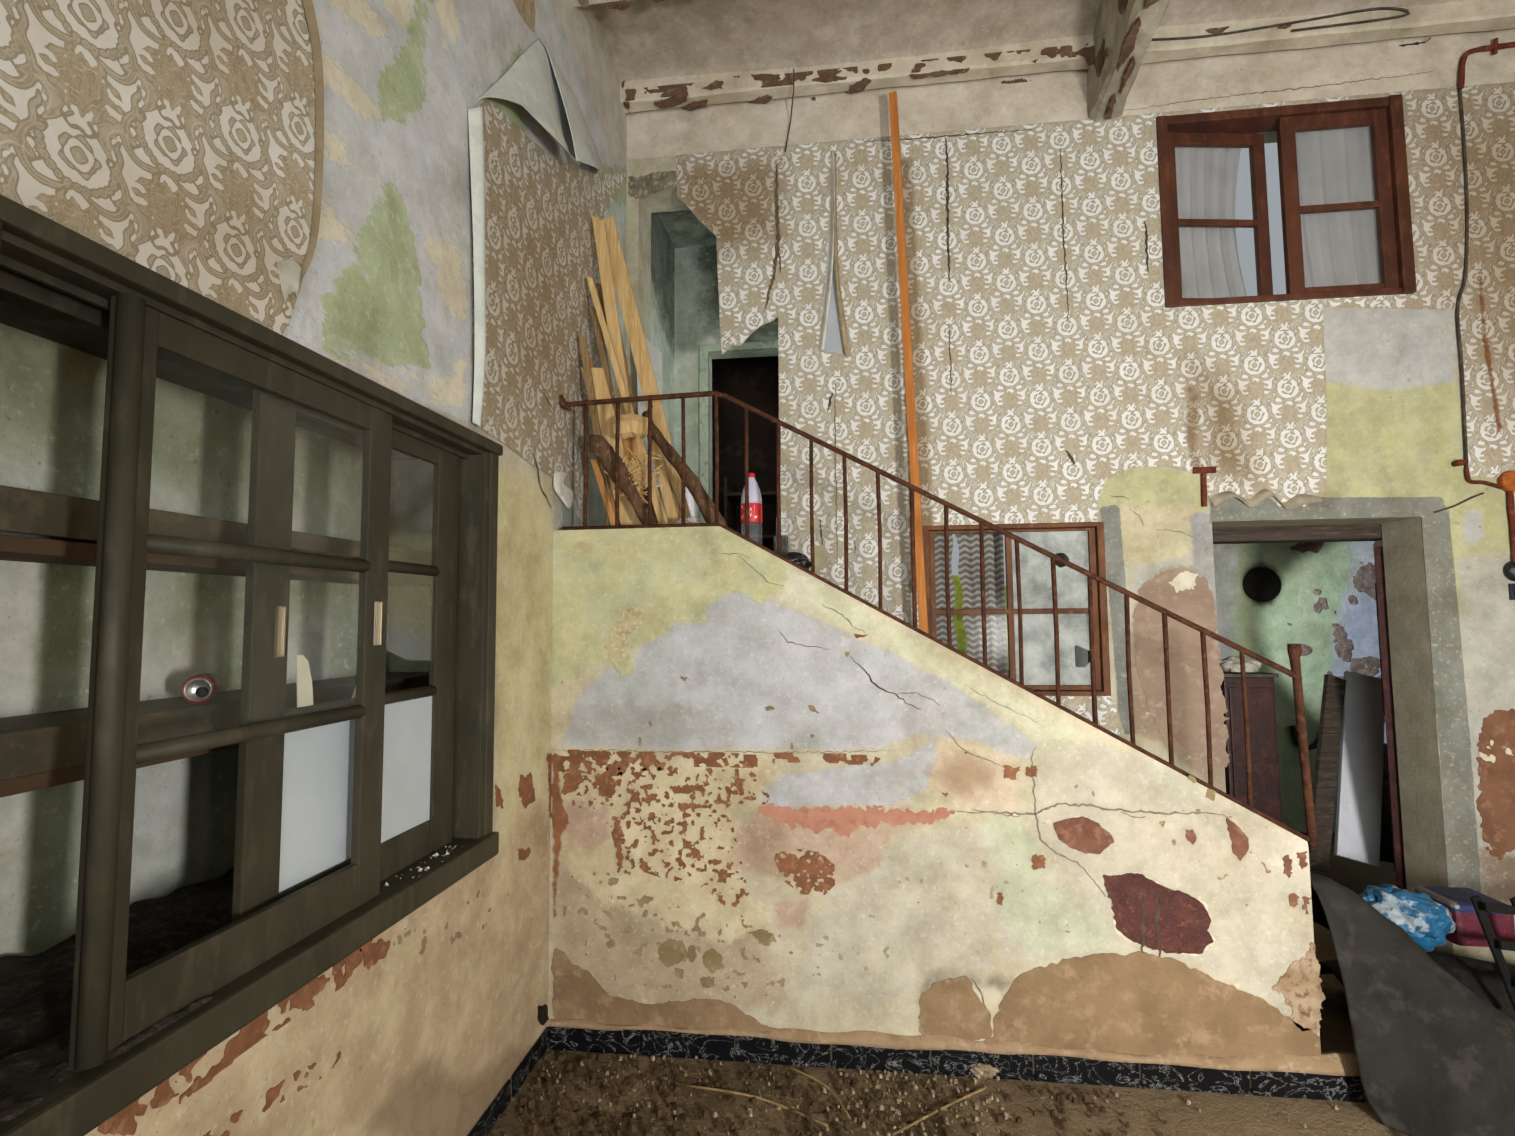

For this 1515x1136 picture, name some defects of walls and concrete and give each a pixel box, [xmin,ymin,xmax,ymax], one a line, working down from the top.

peeling [621,63,892,113]
peeling [909,56,970,79]
peeling [984,0,1159,119]
crack [722,553,784,586]
flaking render [1313,540,1383,679]
crack [560,747,890,755]
crack [778,605,1232,897]
flaking render [1476,709,1515,860]
flaking render [495,721,800,1038]
peeling [774,849,835,895]
peeling [97,928,427,1136]
flaking render [918,872,1326,1057]